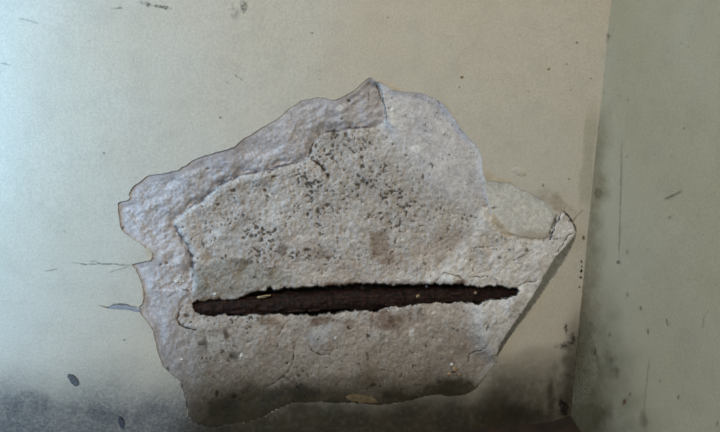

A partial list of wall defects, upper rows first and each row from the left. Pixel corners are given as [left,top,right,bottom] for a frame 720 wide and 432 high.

leakage [0,325,605,432]
spalling [118,78,576,425]